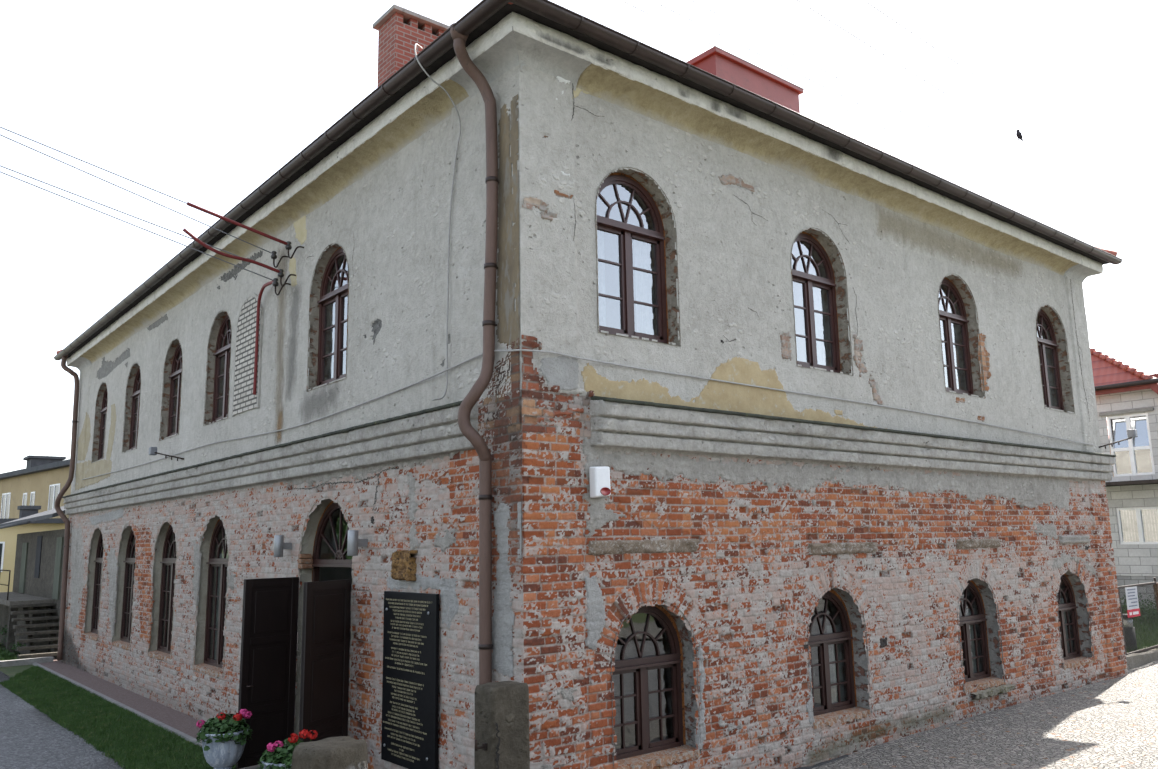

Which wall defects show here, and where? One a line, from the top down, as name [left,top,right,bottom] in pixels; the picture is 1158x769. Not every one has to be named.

peeling [478,94,1099,582]
peeling [75,403,116,490]
spalling [406,466,476,557]
peeling [70,507,124,648]
spalling [133,525,155,644]
peeling [192,537,202,610]
peeling [227,573,242,603]
peeling [386,574,459,629]
spalling [355,586,377,741]
spalling [530,685,578,733]
peeling [718,713,743,731]